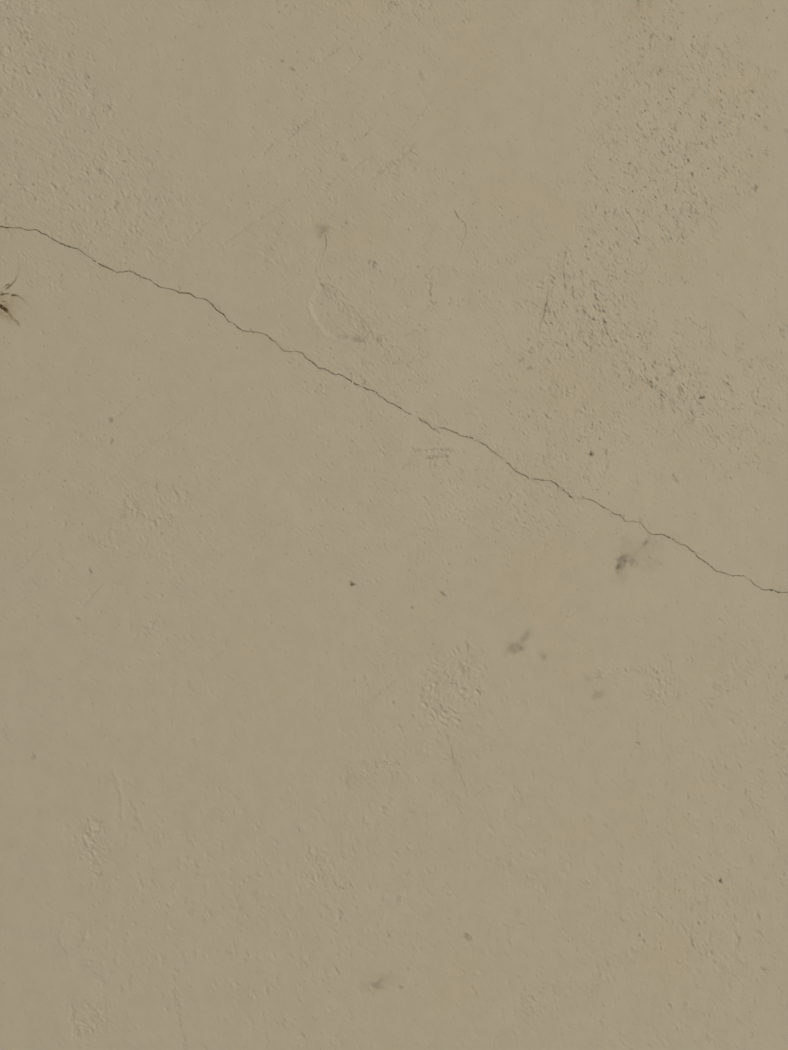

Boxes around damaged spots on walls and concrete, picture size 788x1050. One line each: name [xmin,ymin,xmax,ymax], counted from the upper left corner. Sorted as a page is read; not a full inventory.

crack [0,209,788,595]